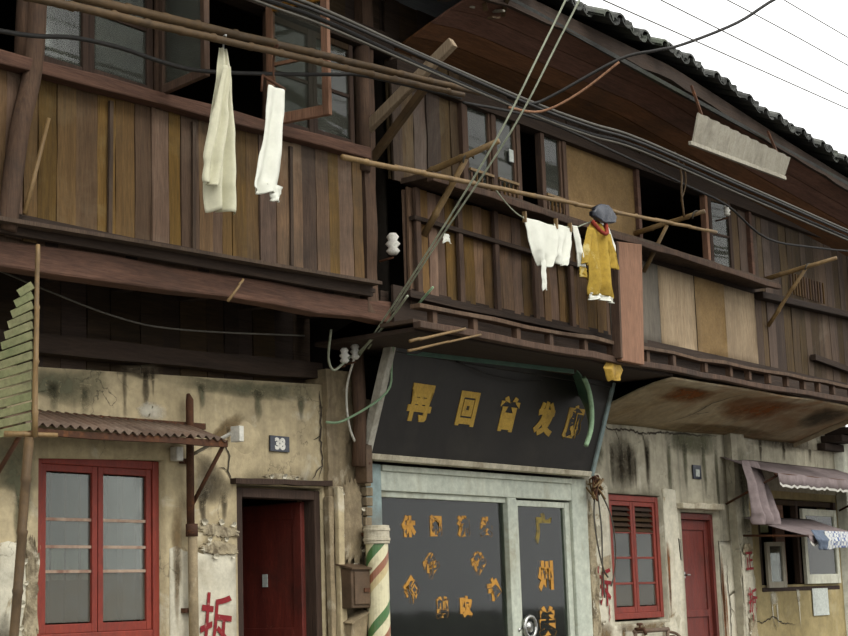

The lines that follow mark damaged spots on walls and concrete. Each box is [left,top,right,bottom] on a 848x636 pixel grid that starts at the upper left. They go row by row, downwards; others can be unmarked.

damp [25,373,96,402]
damp [124,366,161,417]
corrosion [667,389,709,401]
damp [598,446,636,481]
peeling [198,519,240,559]
peeling [19,535,40,636]